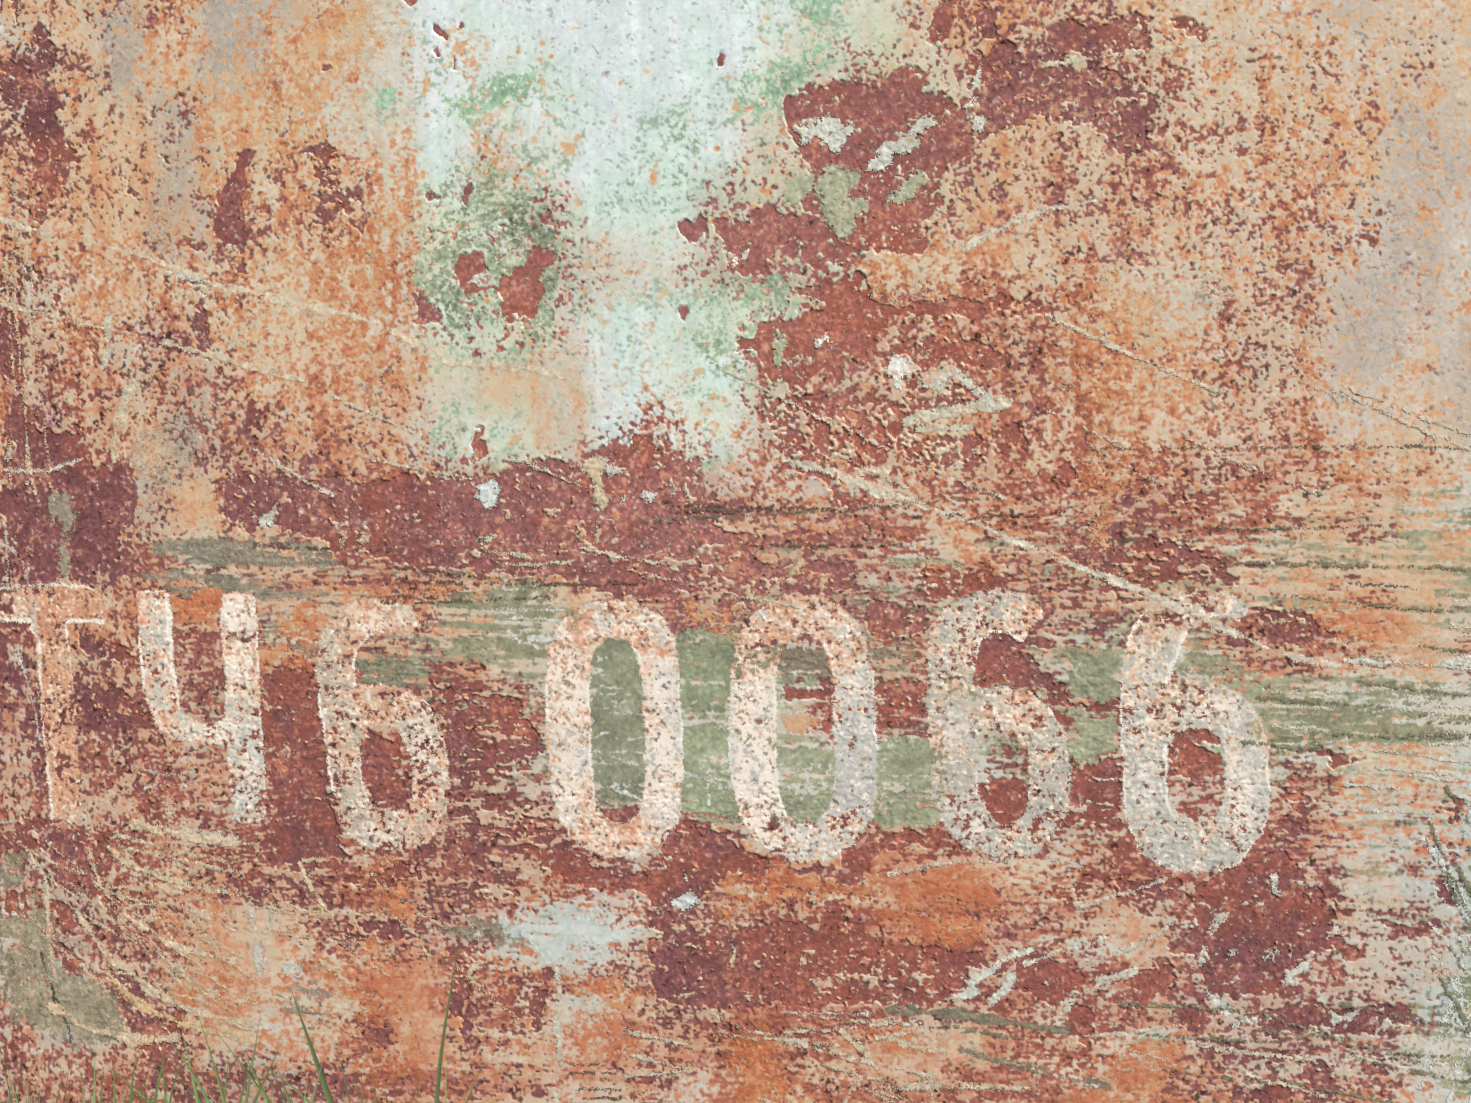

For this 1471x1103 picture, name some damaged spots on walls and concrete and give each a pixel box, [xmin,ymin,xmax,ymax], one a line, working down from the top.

rust [188,0,394,171]
rust [308,214,425,411]
peeling [454,246,557,323]
peeling [677,0,1212,511]
rust [1044,262,1179,565]
peeling [223,424,857,609]
peeling [863,565,1035,640]
peeling [259,668,520,907]
peeling [336,916,416,949]
rust [321,844,432,1095]
rust [562,969,663,1064]
rust [717,860,1017,951]